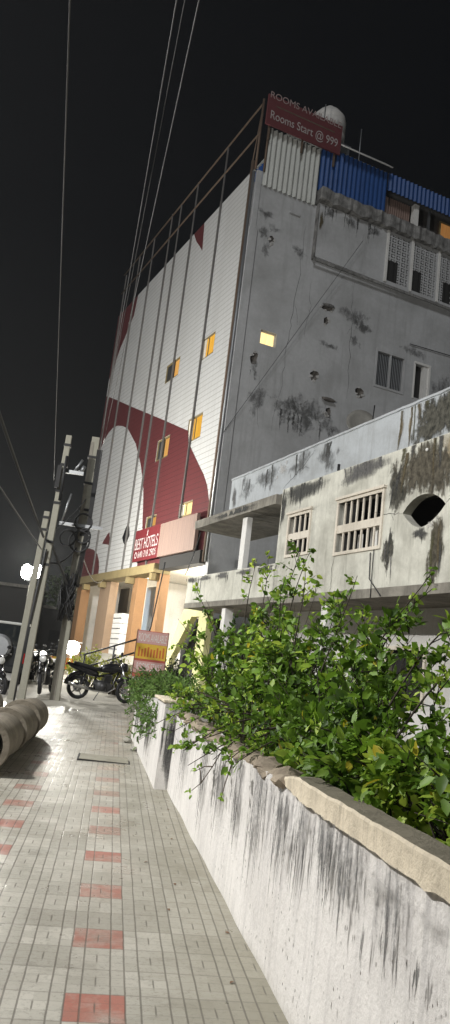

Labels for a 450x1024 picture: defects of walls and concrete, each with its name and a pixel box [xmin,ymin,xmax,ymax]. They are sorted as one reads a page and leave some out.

leakage [279,385,450,532]
leakage [382,528,394,575]
leakage [413,518,444,584]
leakage [160,718,189,797]
leakage [196,741,358,937]
leakage [375,868,399,987]